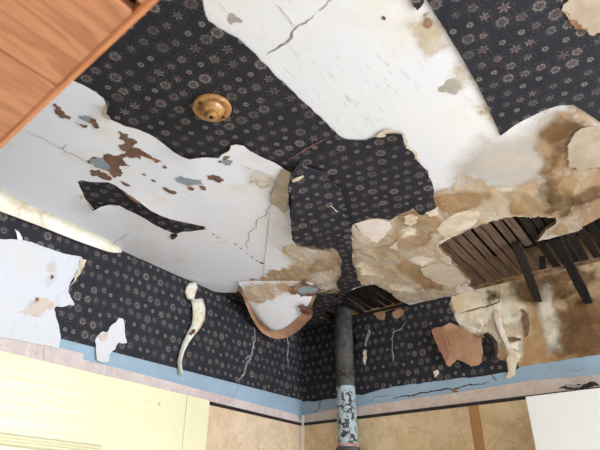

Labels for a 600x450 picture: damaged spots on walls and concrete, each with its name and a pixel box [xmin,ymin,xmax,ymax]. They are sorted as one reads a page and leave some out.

crack [267,0,331,55]
peeling [52,104,99,129]
peeling [87,131,167,187]
peeling [566,126,600,171]
peeling [175,175,224,191]
crack [246,173,280,258]
peeling [351,219,391,245]
peeling [436,211,480,239]
leakage [351,109,600,362]
peeling [451,282,510,314]
peeling [177,282,206,375]
crack [369,375,498,401]